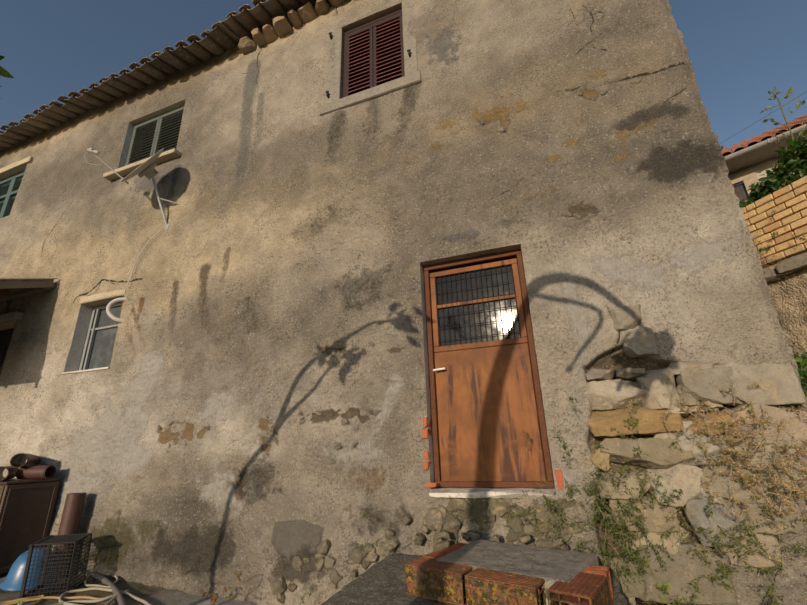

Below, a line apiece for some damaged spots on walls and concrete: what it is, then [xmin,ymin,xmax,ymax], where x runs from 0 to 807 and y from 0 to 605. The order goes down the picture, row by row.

crack [568,6,607,54]
crack [608,62,686,84]
spalling [609,304,659,358]
spalling [157,420,210,453]
spalling [584,361,807,605]
leakage [153,523,234,575]
leakage [272,549,326,589]